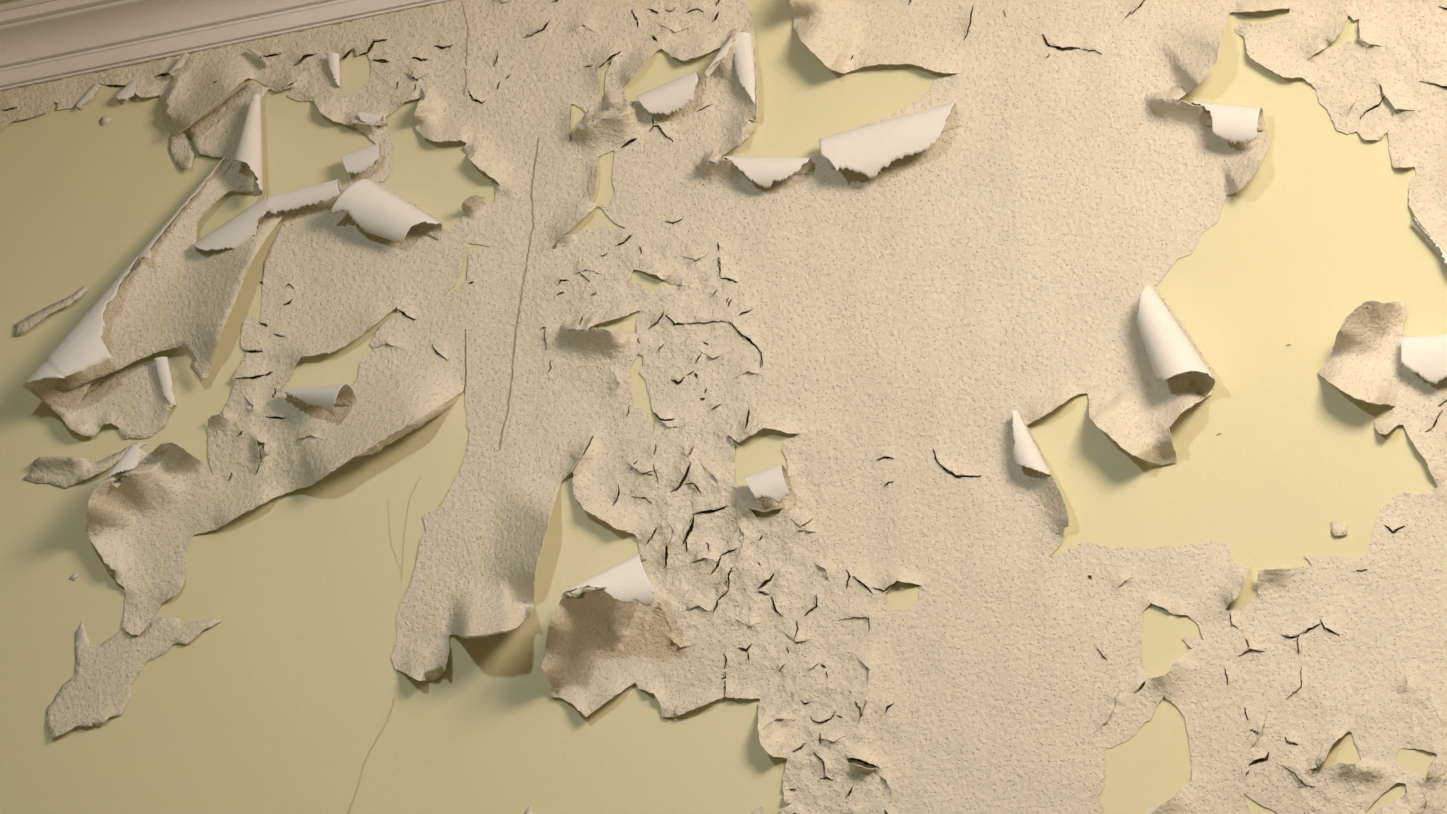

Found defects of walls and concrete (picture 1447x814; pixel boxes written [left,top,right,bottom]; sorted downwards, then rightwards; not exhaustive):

peeling [0,0,826,814]
crack [499,137,642,450]
crack [613,243,921,814]
peeling [553,0,1447,814]